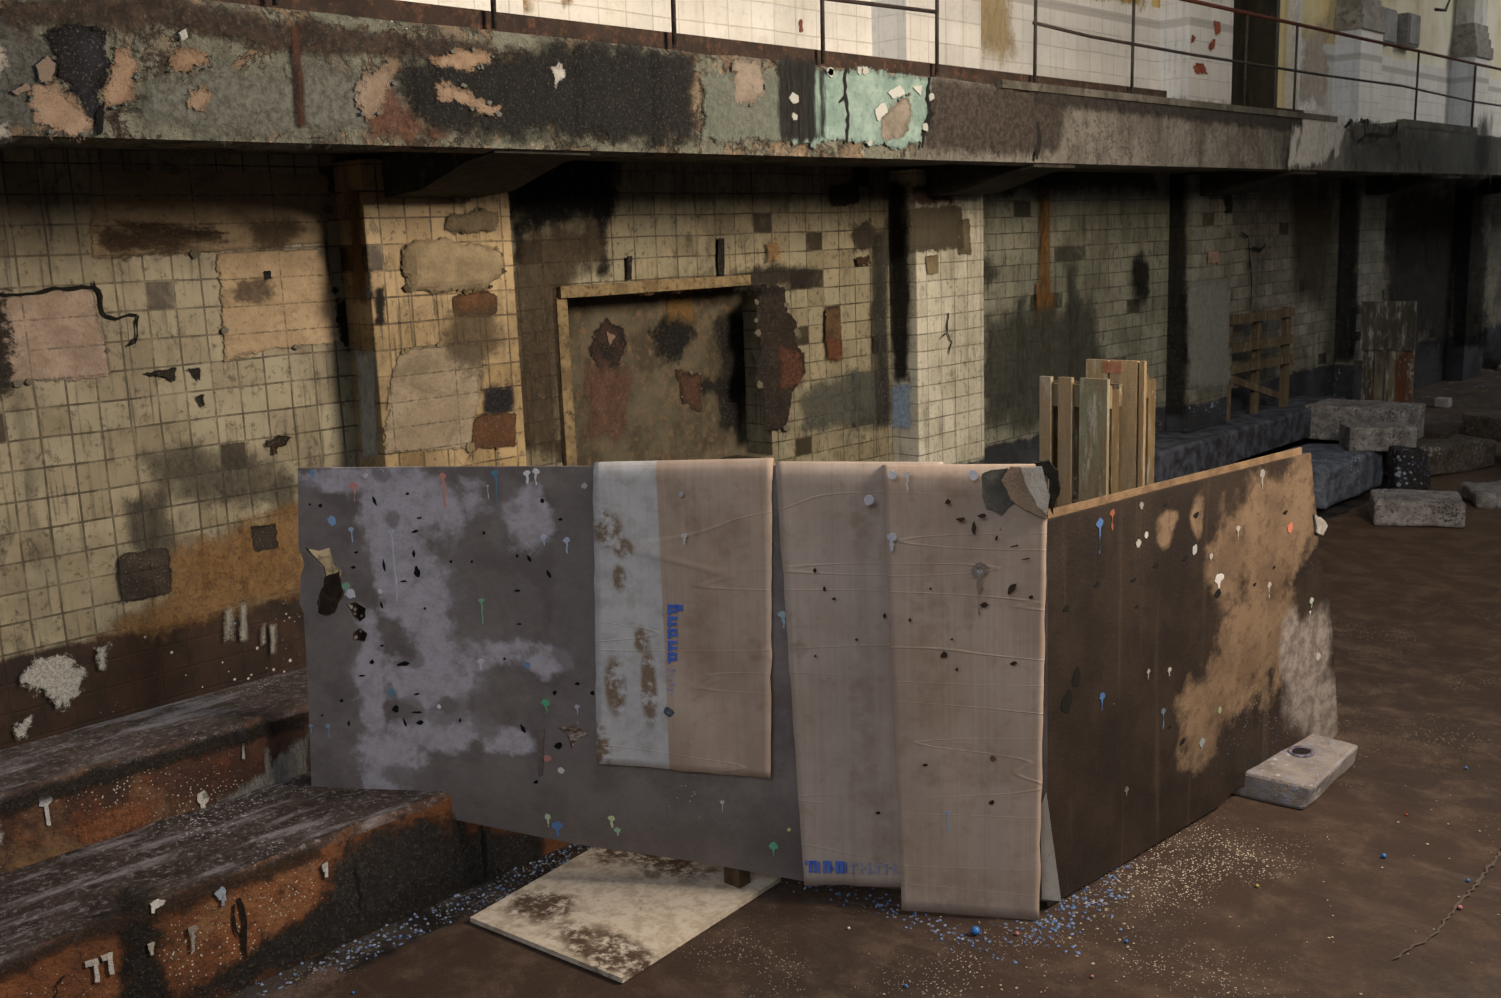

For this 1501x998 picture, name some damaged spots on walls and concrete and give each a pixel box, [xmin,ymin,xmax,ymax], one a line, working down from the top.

peeling [0,16,408,143]
damp [4,0,489,109]
spalling [429,47,502,118]
peeling [700,55,934,151]
crack [0,281,139,346]
peeling [382,341,483,454]
efflorescence [14,642,112,740]